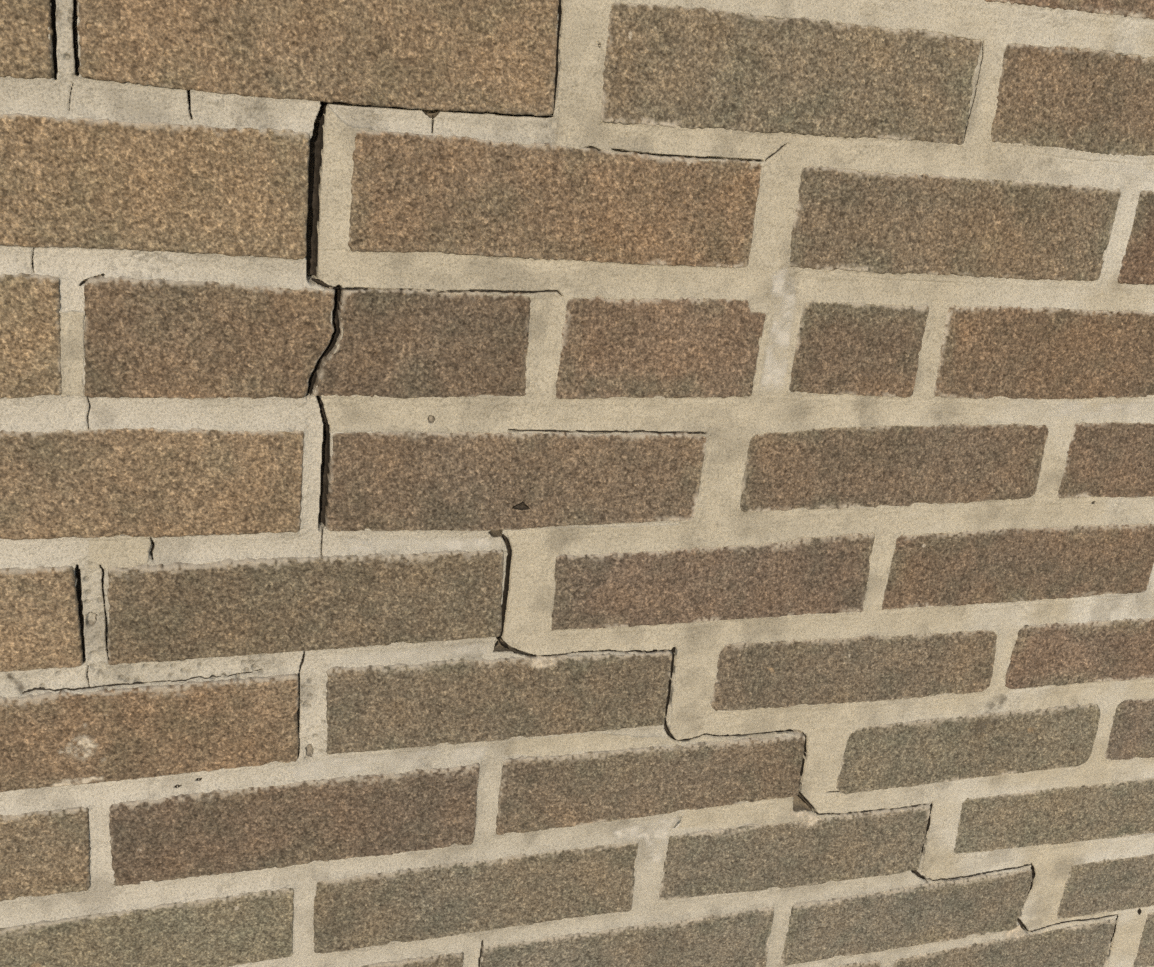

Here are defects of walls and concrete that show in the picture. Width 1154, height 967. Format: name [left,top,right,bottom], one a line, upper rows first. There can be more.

crack [963,44,983,143]
crack [588,143,787,161]
crack [306,0,562,554]
crack [508,427,707,435]
crack [22,564,261,694]
crack [297,651,305,758]
crack [496,534,1118,951]